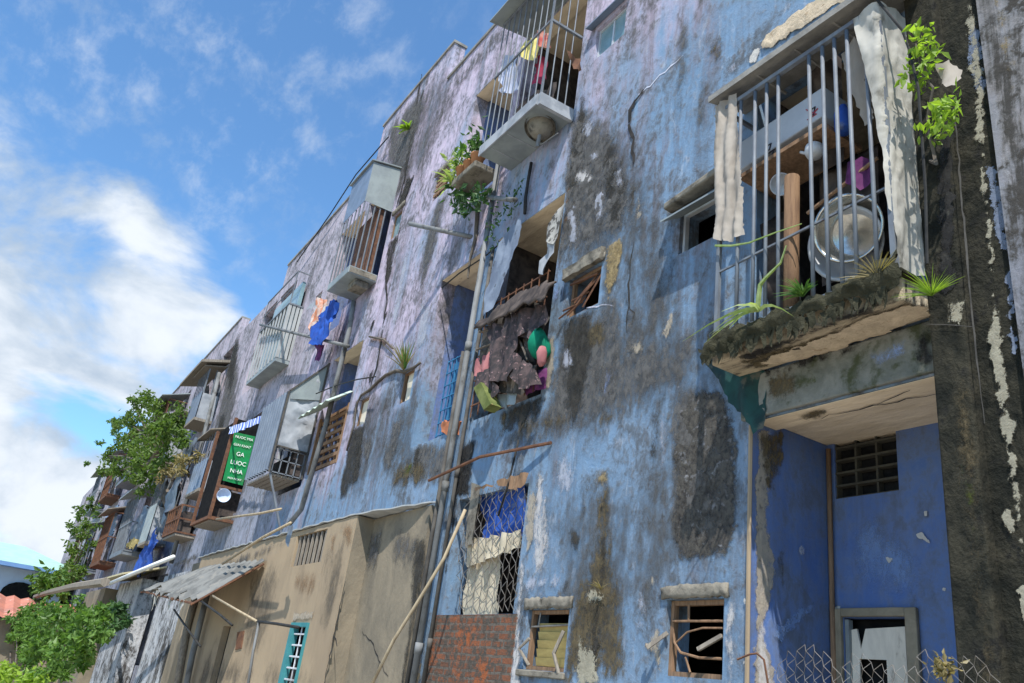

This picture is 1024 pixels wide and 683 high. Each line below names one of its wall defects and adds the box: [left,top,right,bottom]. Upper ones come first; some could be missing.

spalling [749,0,845,63]
peeling [967,26,986,90]
mould [568,96,587,193]
peeling [559,112,641,299]
mould [603,143,626,228]
crack [628,55,683,163]
peeling [986,166,1008,250]
peeling [1005,271,1018,354]
crack [822,390,935,419]
damp [565,473,625,683]
flaking render [726,429,811,683]